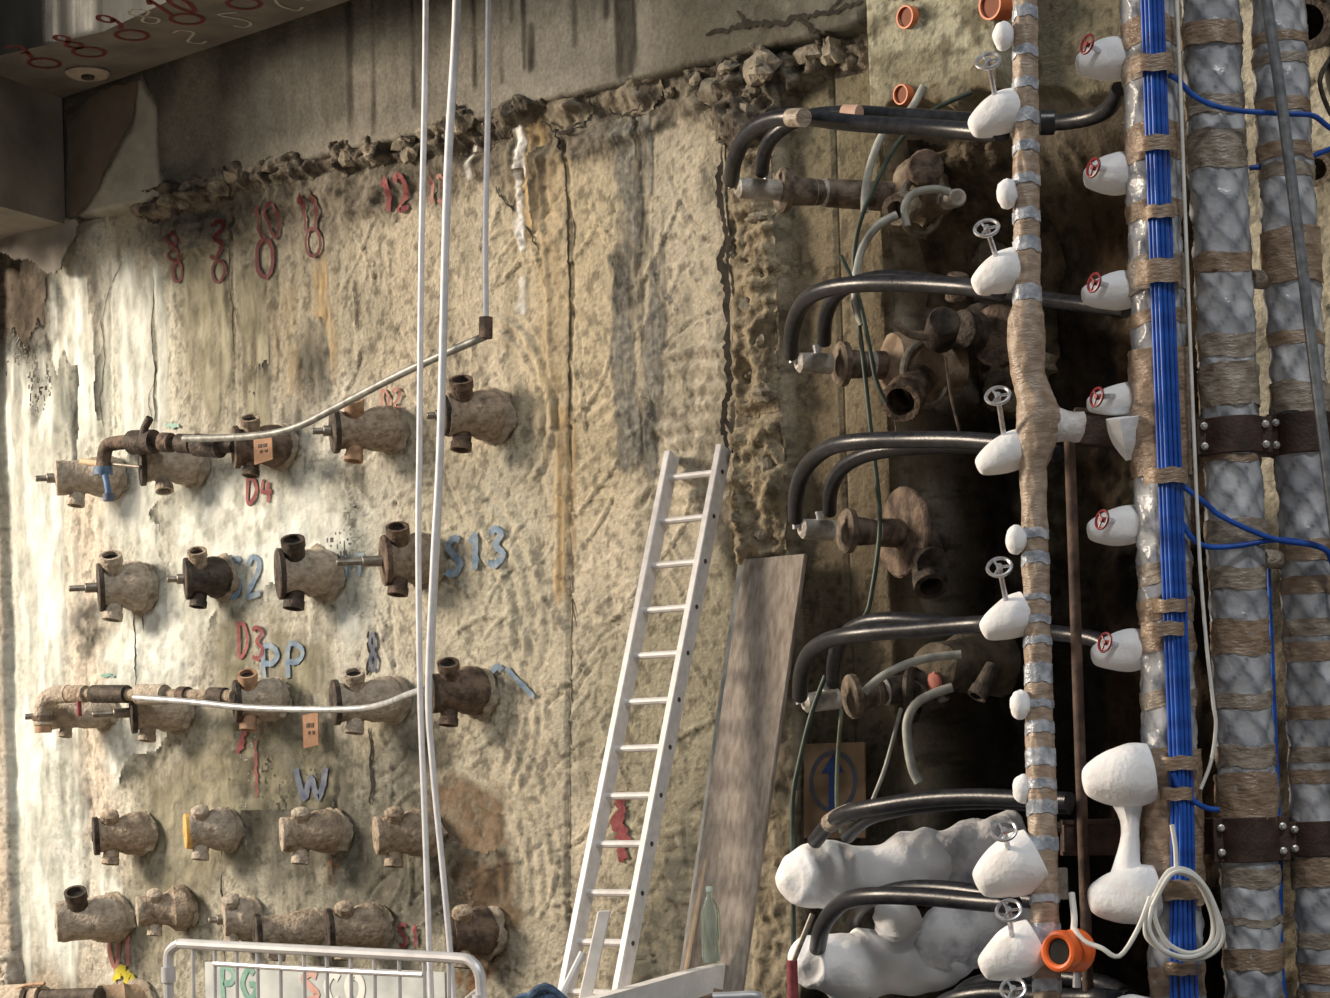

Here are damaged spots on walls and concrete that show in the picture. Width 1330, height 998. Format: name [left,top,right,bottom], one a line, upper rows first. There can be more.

peeling [0,261,51,413]
spalling [130,94,547,224]
damp [607,111,665,482]
crack [715,144,734,453]
crack [705,0,863,39]
damp [0,245,521,987]
crack [496,94,640,916]